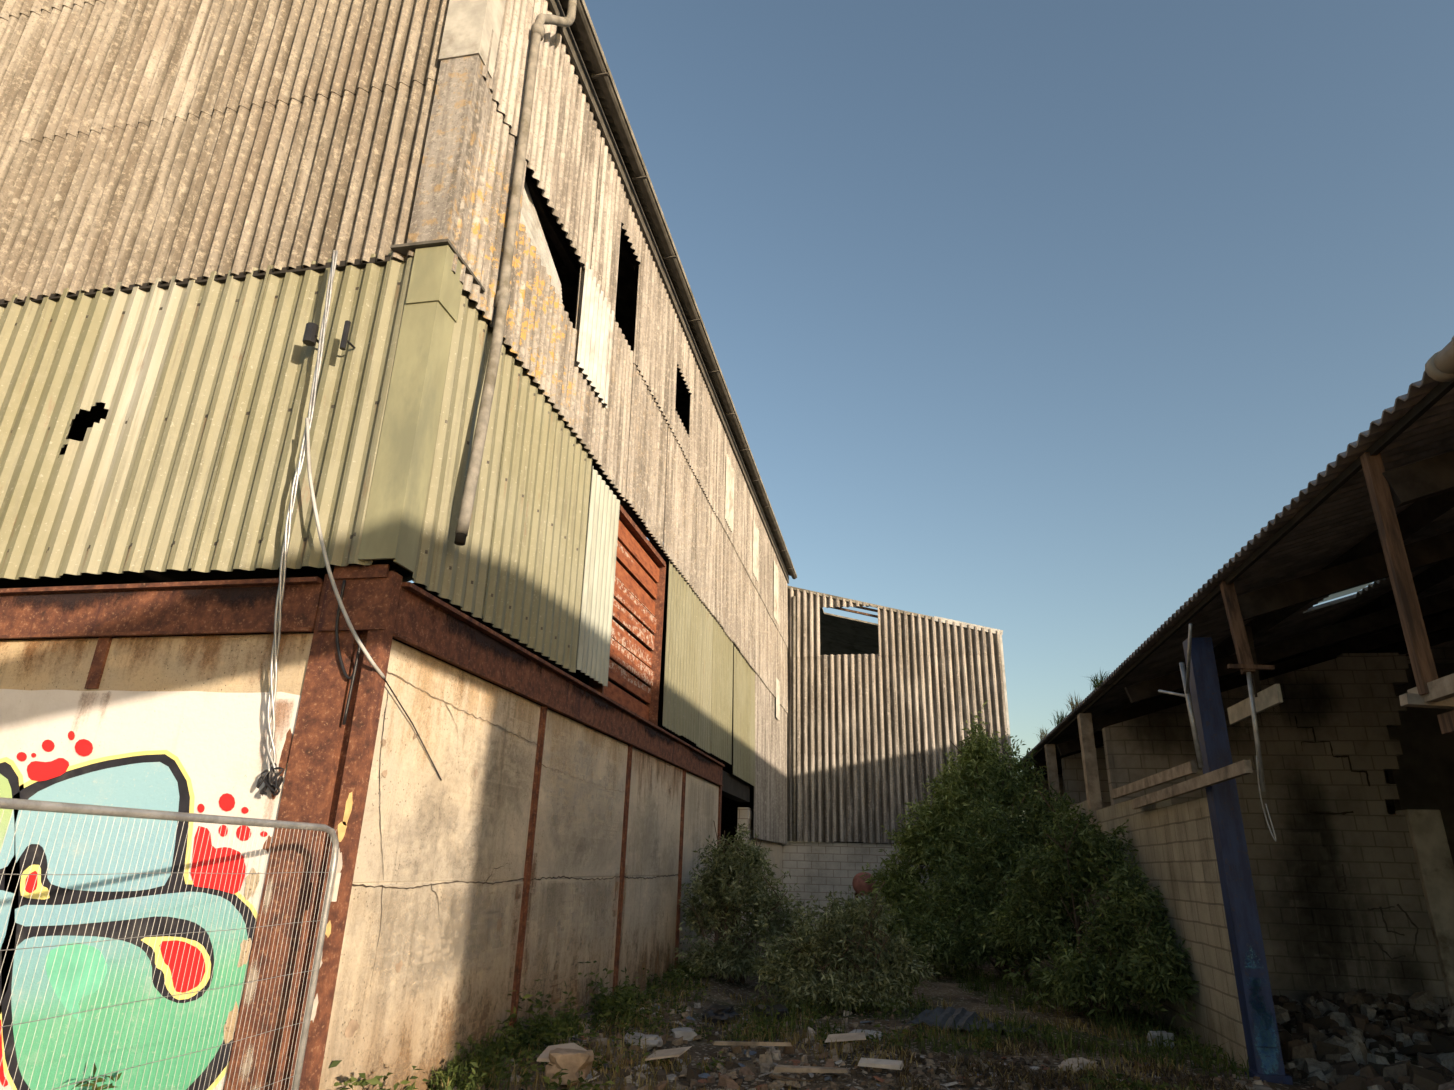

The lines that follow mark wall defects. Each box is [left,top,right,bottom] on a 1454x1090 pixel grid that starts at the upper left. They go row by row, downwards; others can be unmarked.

rust [271,703,293,799]
peeling [336,792,353,873]
leakage [384,893,503,989]
peeling [310,994,318,1022]